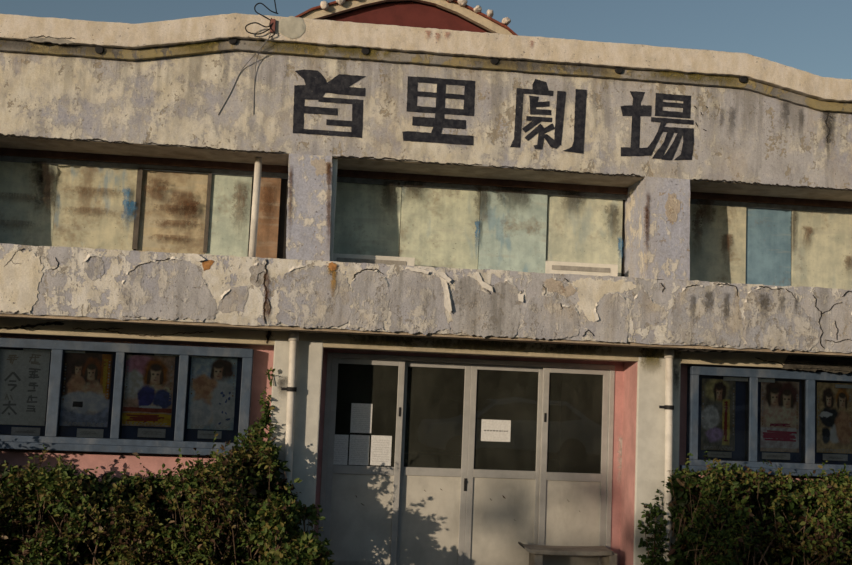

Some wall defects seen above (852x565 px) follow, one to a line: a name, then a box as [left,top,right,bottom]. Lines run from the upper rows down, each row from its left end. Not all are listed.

peeling [0,249,44,314]
peeling [83,253,105,281]
crack [0,322,213,337]
peeling [119,253,264,322]
crack [255,260,273,343]
rust [328,262,337,287]
peeling [275,264,852,374]
crack [686,283,852,348]